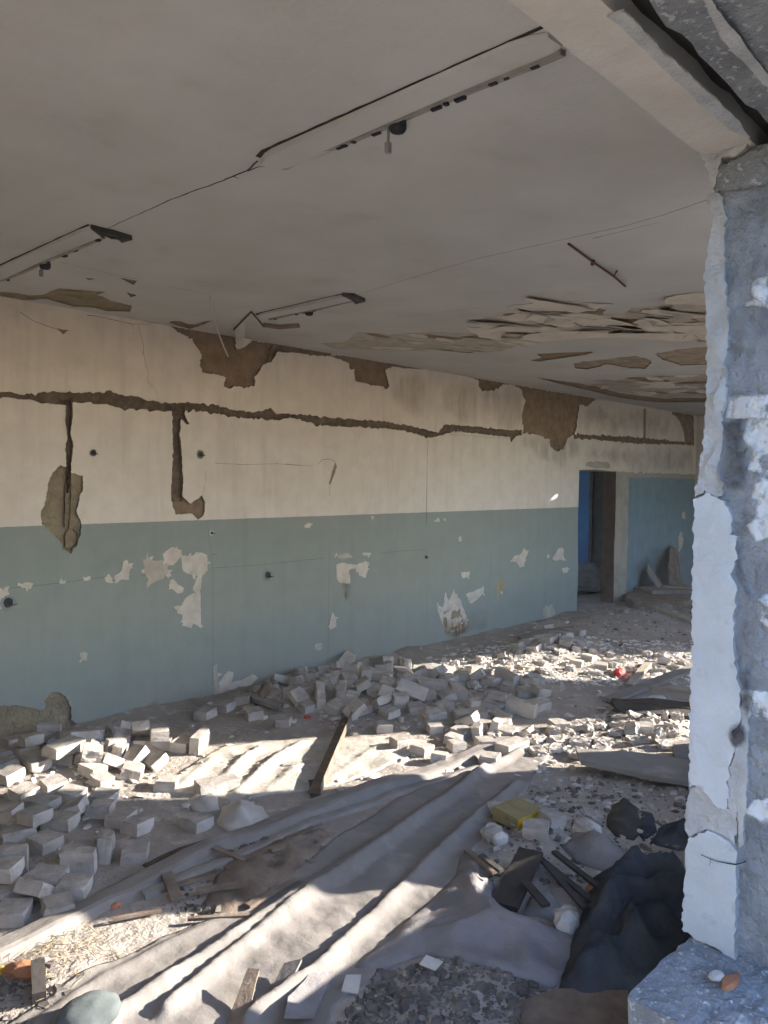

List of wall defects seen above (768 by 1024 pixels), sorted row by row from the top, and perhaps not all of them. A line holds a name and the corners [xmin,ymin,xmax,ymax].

crack [109,161,264,228]
spalling [0,278,136,312]
spalling [169,292,708,452]
spalling [41,465,83,553]
peeling [105,546,211,628]
peeling [335,552,371,584]
peeling [437,579,506,632]
spalling [0,692,77,739]